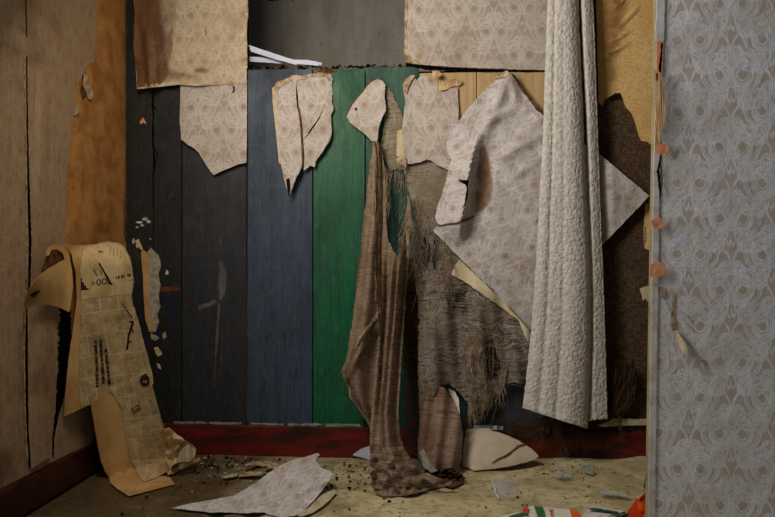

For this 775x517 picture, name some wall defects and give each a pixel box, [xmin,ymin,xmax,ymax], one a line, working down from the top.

water stain [133,0,176,87]
peeling [83,73,93,100]
peeling [403,75,415,93]
peeling [432,71,462,91]
peeling [132,238,169,369]